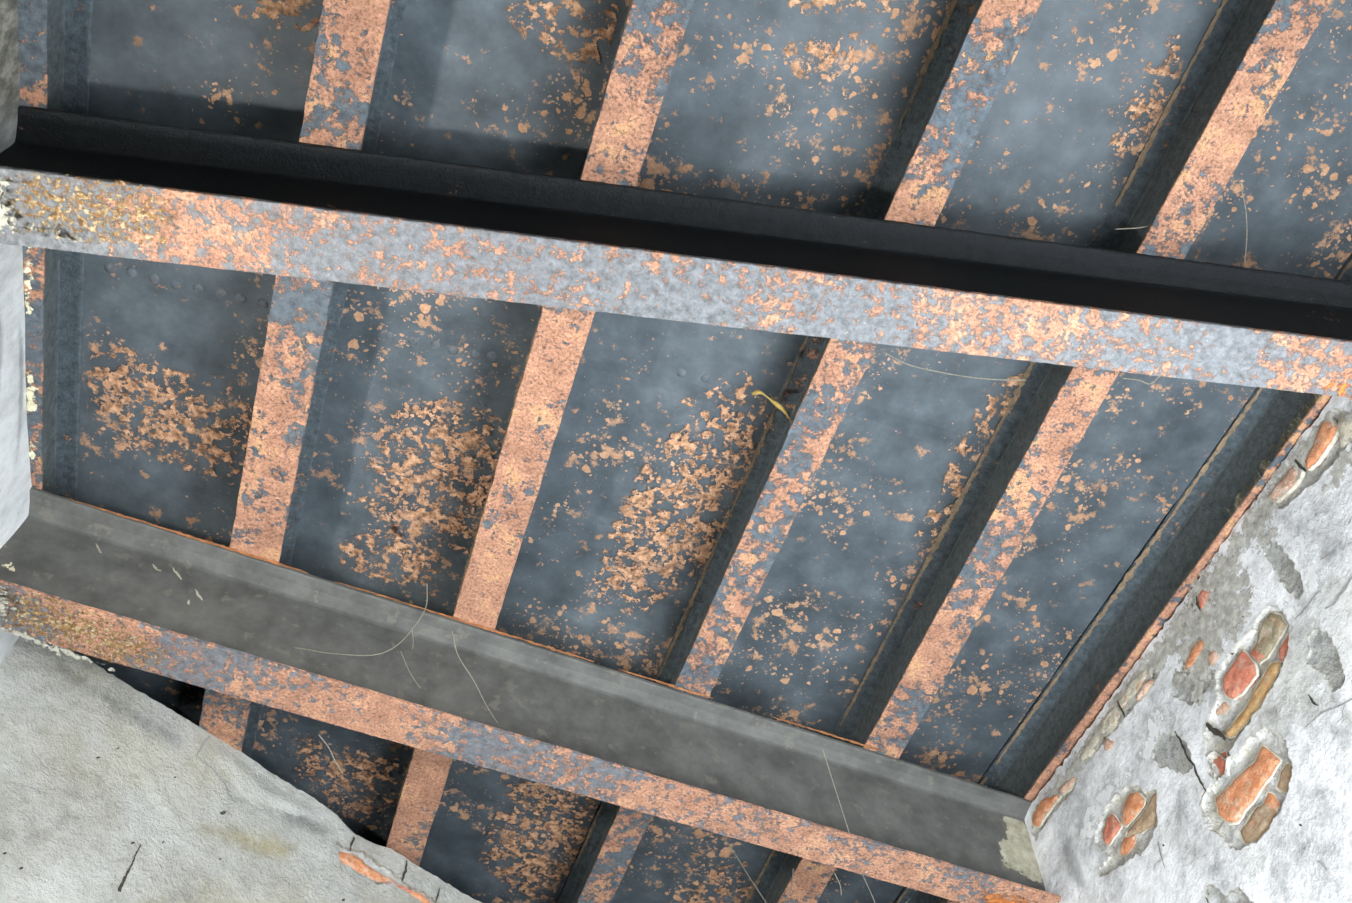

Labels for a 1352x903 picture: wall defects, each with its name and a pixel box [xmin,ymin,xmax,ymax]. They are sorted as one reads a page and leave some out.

corrosion [507,0,633,64]
corrosion [784,32,880,79]
corrosion [788,0,898,15]
corrosion [1,173,177,244]
corrosion [87,346,251,479]
corrosion [334,305,595,662]
corrosion [595,336,808,699]
spalling [1031,407,1352,851]
corrosion [292,737,415,824]
corrosion [479,781,604,897]
spalling [1080,770,1165,877]
spalling [1206,884,1253,903]